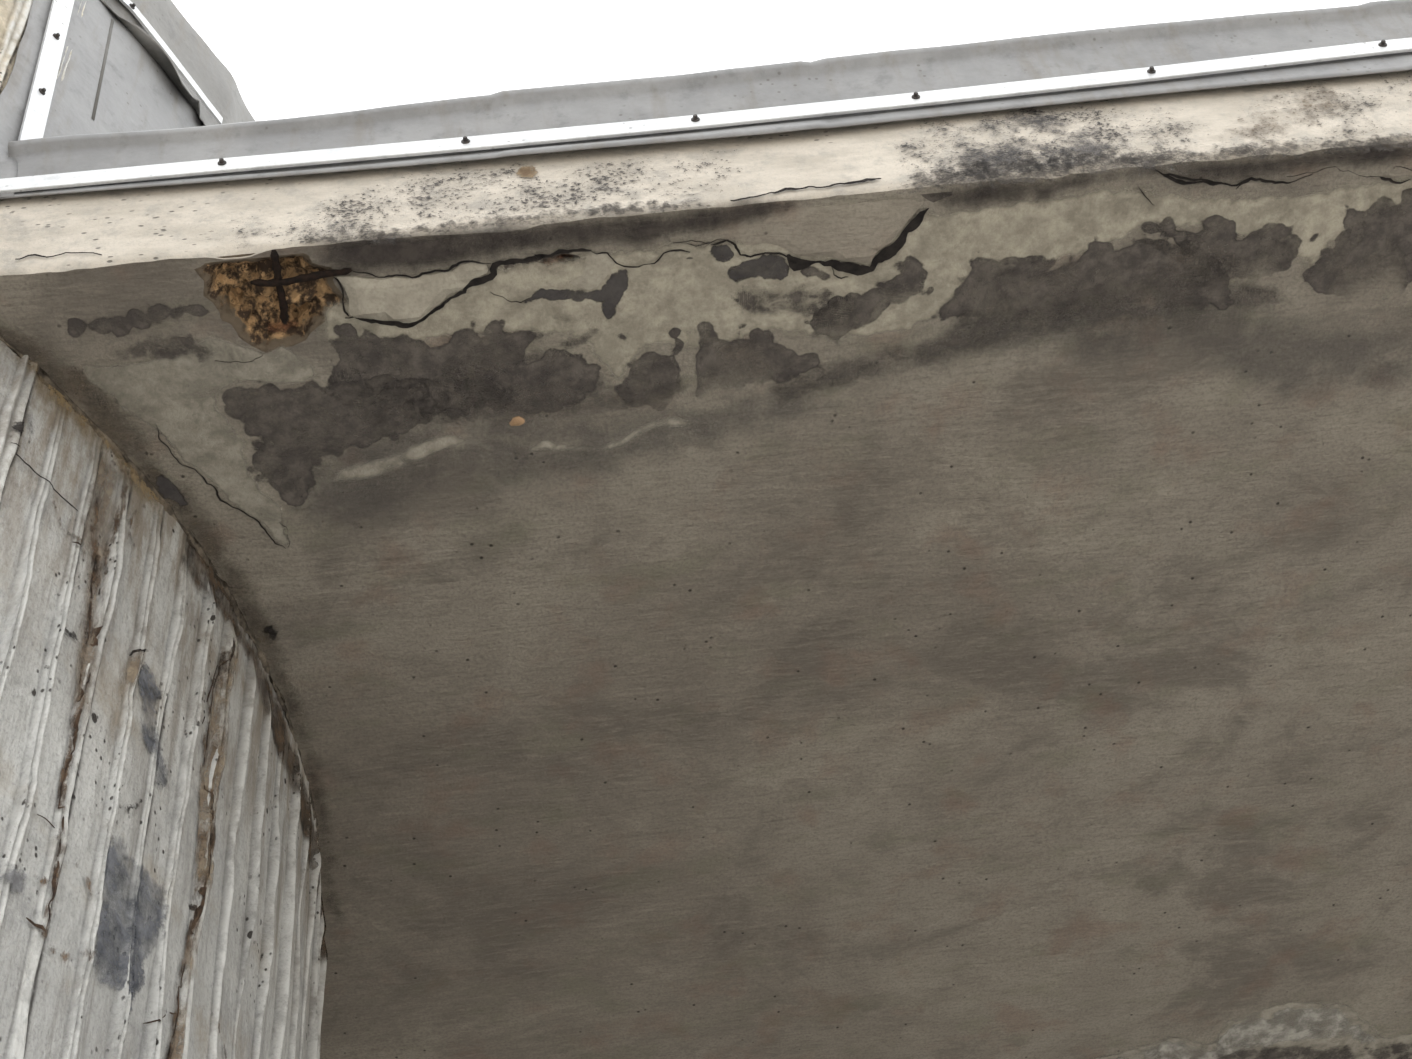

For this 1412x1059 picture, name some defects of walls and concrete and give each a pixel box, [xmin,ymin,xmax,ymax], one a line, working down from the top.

damp [233,150,742,248]
crack [730,178,881,201]
damp [888,100,1201,197]
crack [1136,165,1412,205]
damp [1225,72,1411,148]
spalling [194,250,616,353]
crack [334,208,929,328]
damp [67,180,1412,545]